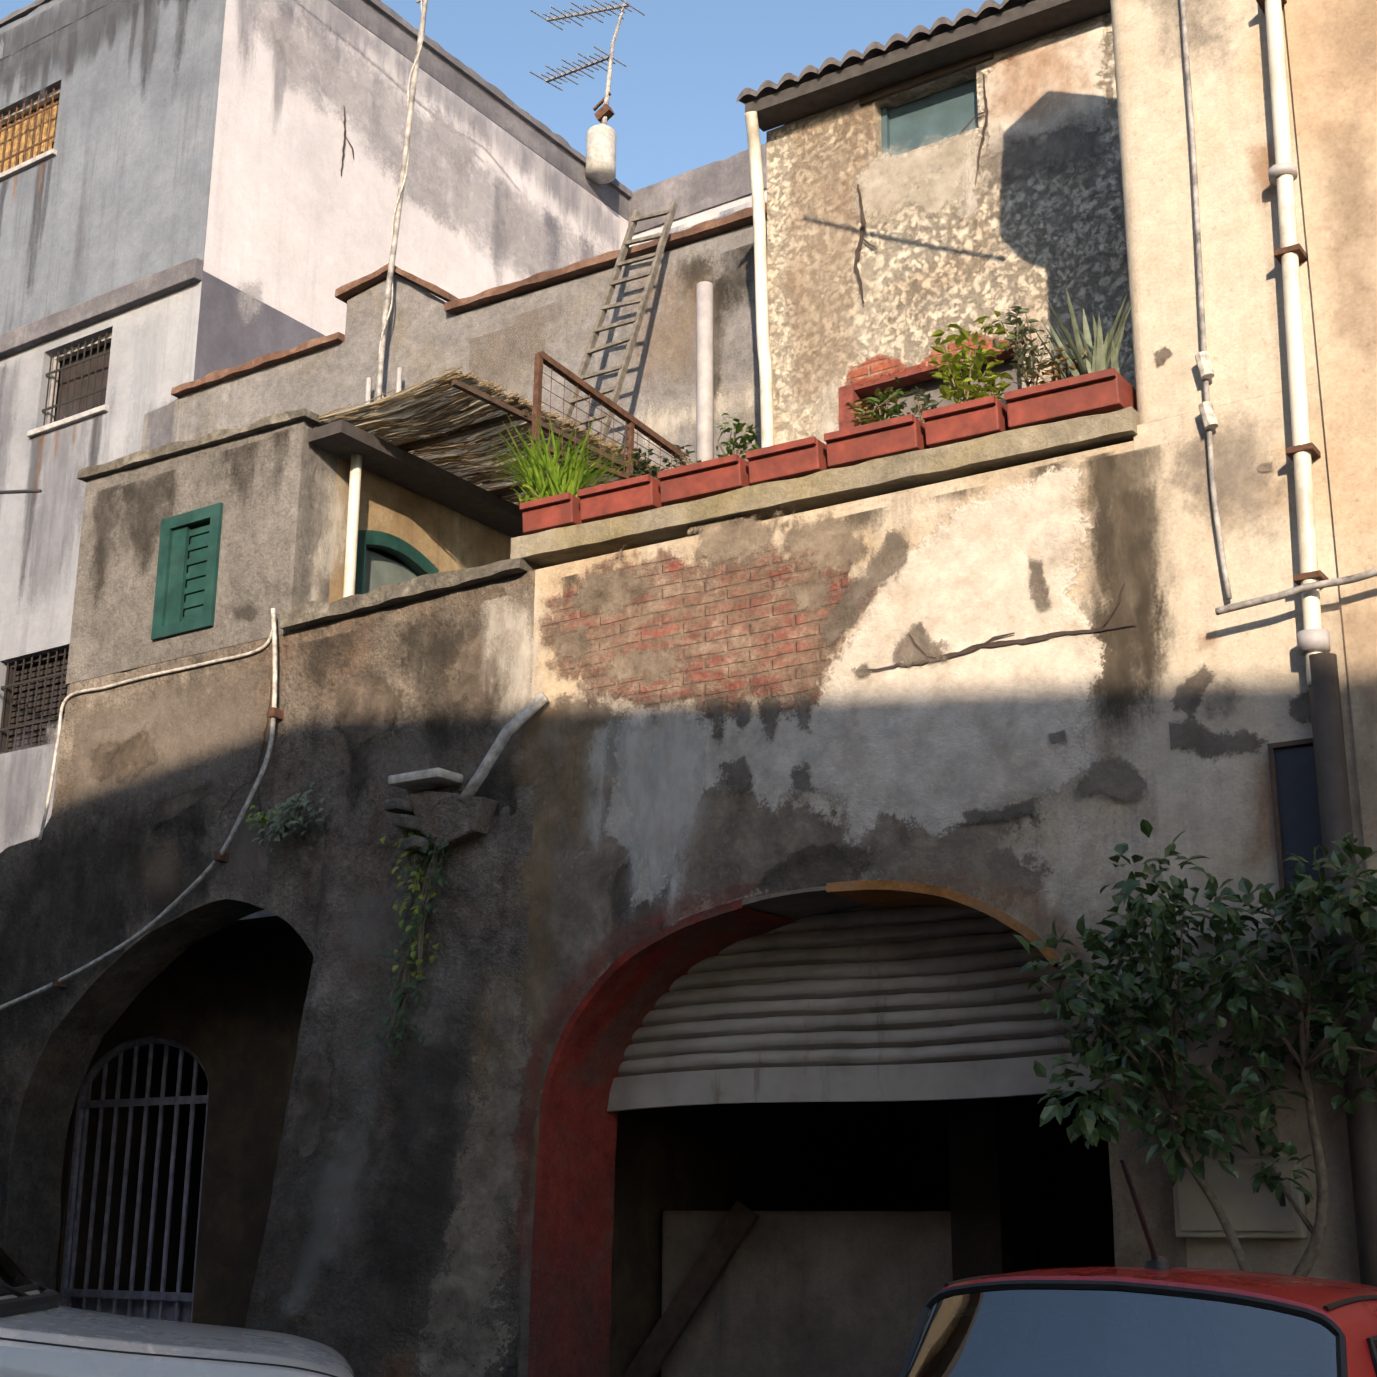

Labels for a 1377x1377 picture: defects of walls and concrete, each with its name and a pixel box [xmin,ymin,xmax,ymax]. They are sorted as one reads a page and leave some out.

damp [0,0,188,95]
crack [295,0,521,192]
crack [959,74,989,183]
crack [853,184,878,304]
flaking render [844,333,1020,386]
damp [89,415,100,466]
damp [21,434,43,581]
damp [94,470,175,591]
damp [489,607,536,708]
crack [868,583,1137,671]
damp [1088,447,1164,730]
flaking render [409,509,1053,1377]